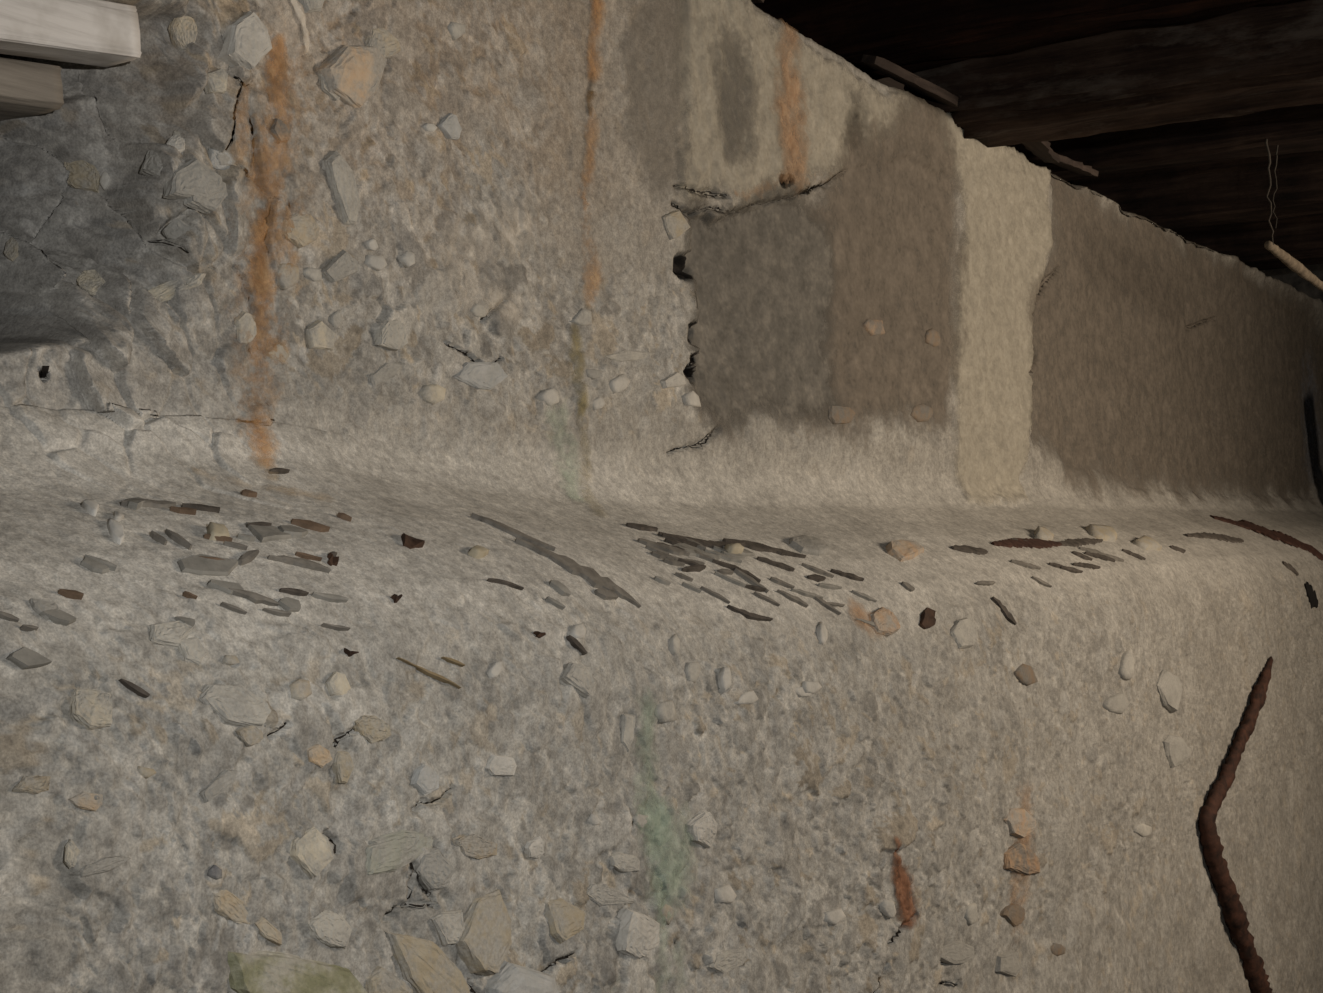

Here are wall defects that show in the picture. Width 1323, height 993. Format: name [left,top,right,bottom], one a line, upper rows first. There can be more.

rust [893,837,916,927]
rust [1199,656,1273,993]